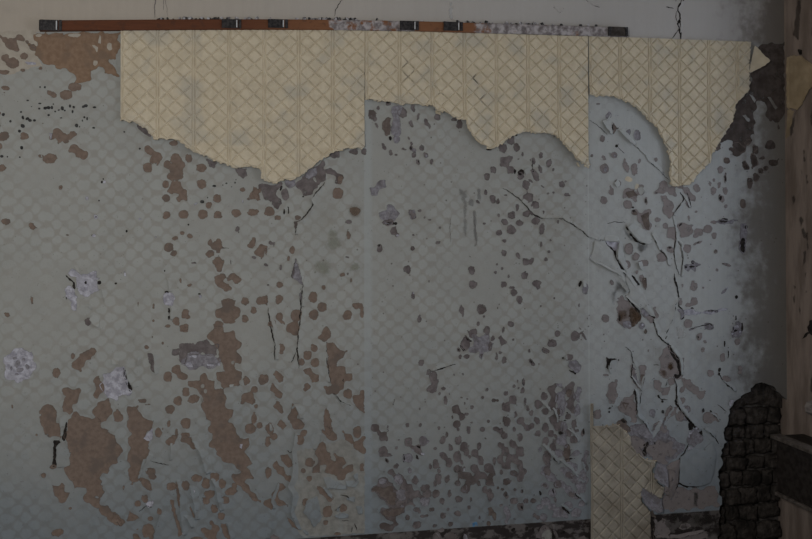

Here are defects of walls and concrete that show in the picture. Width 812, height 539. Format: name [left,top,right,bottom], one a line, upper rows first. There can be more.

crack [668,0,684,39]
peeling [0,30,121,100]
peeling [49,128,88,160]
peeling [137,125,366,233]
peeling [368,101,441,165]
flaking render [379,204,431,237]
peeling [476,134,567,304]
crack [503,188,622,240]
peeling [588,42,785,334]
crack [589,120,719,471]
flaking render [677,281,727,352]
peeling [35,237,589,539]